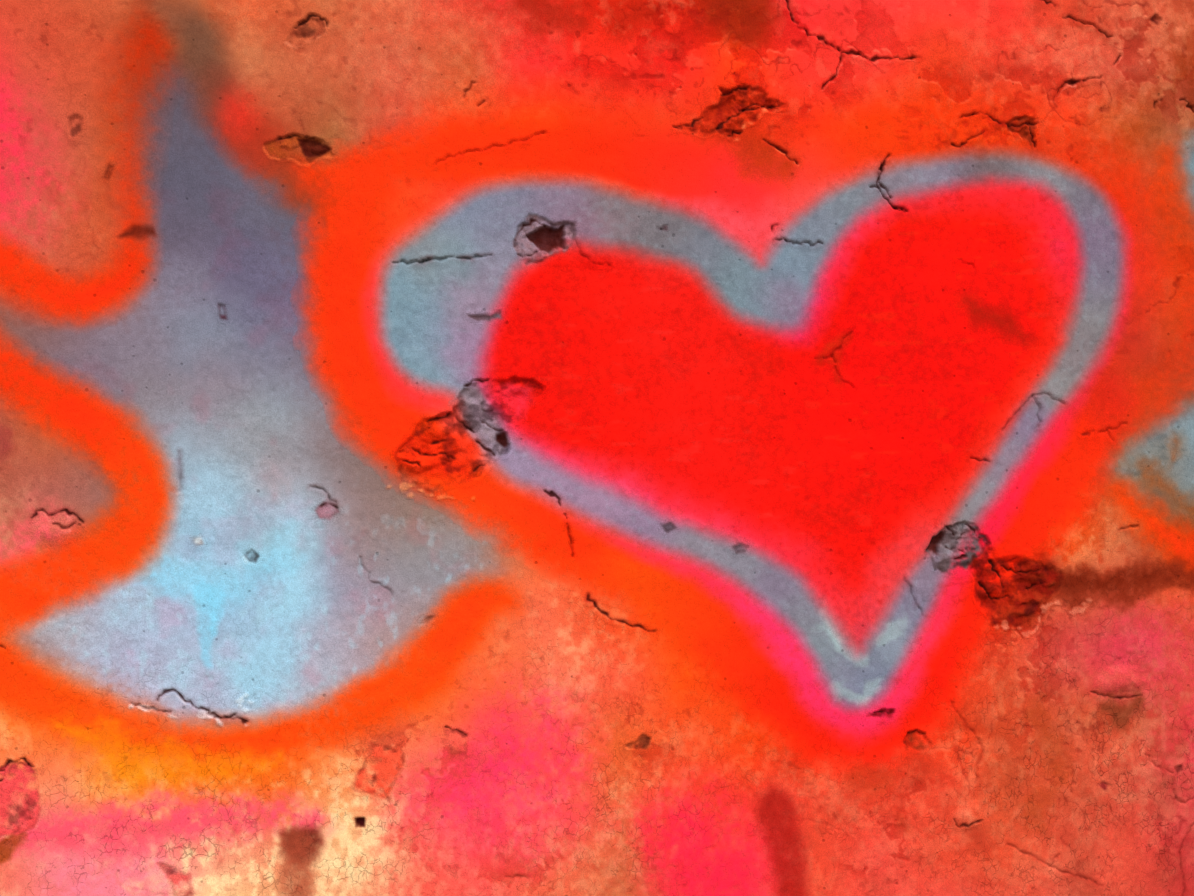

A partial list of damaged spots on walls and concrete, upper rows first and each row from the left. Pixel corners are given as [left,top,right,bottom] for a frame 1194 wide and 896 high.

crack [783,0,926,92]
flaking render [672,79,791,142]
flaking render [260,129,339,169]
crack [869,152,911,217]
crack [390,250,498,269]
flaking render [508,209,583,269]
flaking render [385,372,550,502]
crack [543,486,577,561]
flaking render [921,518,1094,638]
crack [581,590,660,637]
crack [126,685,254,729]
flaking render [0,754,45,841]